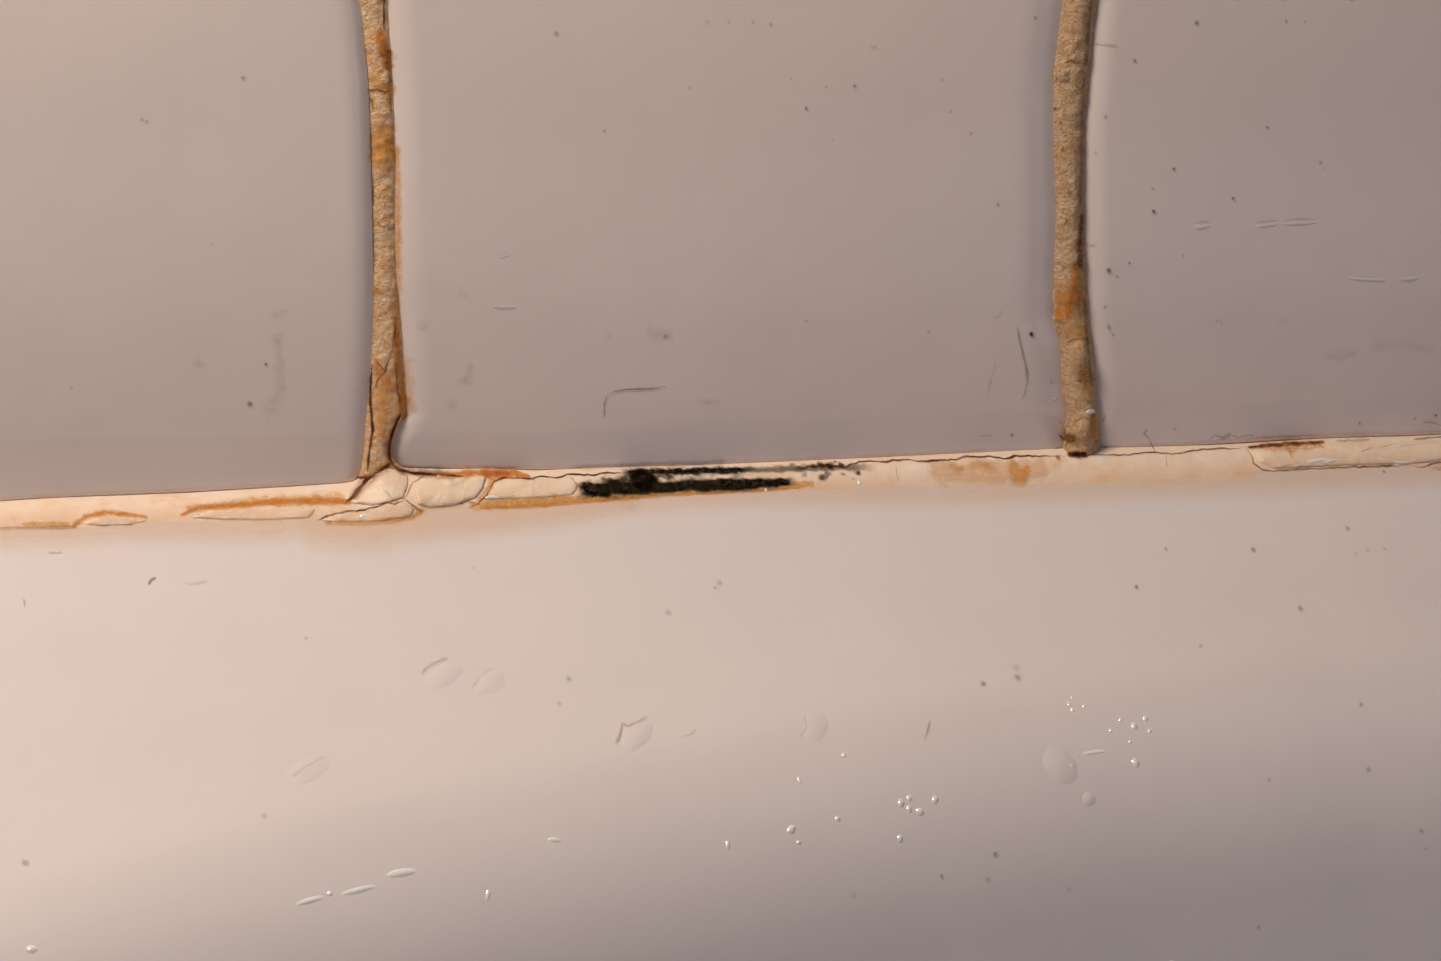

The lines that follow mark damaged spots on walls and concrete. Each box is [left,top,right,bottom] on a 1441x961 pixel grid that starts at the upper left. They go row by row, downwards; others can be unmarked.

corrosion [371,31,394,96]
corrosion [370,124,413,437]
corrosion [1055,265,1085,337]
crack [319,324,620,520]
corrosion [1063,412,1096,442]
crack [797,435,1441,472]
water stain [579,462,860,498]
corrosion [22,510,146,528]
corrosion [181,494,423,525]